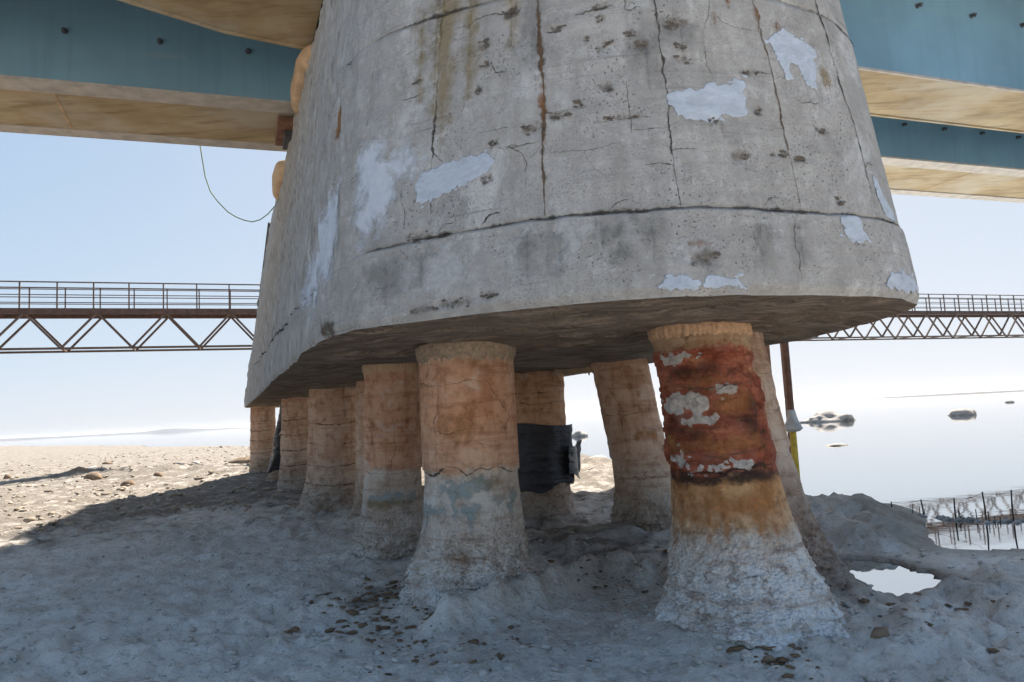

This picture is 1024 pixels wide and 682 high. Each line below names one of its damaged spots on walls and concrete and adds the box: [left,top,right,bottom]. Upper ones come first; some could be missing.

crack [327,0,505,162]
peeling [666,70,762,123]
peeling [764,24,818,90]
crack [356,0,898,275]
peeling [354,140,497,234]
peeling [834,196,871,244]
peeling [658,251,747,292]
peeling [887,269,919,294]